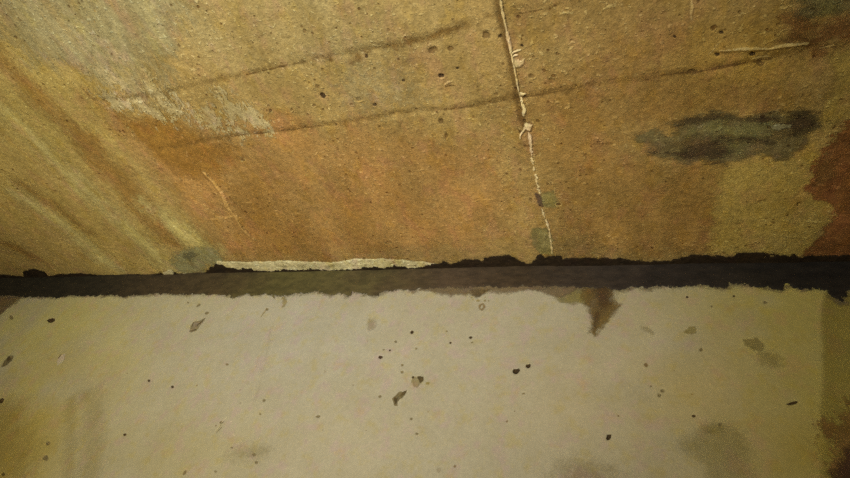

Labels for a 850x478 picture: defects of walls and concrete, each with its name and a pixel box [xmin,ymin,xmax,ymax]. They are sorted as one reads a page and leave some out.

crack [496,0,567,254]
leakage [519,54,850,256]
crack [663,58,772,76]
rust [803,120,850,256]
leakage [557,286,620,335]